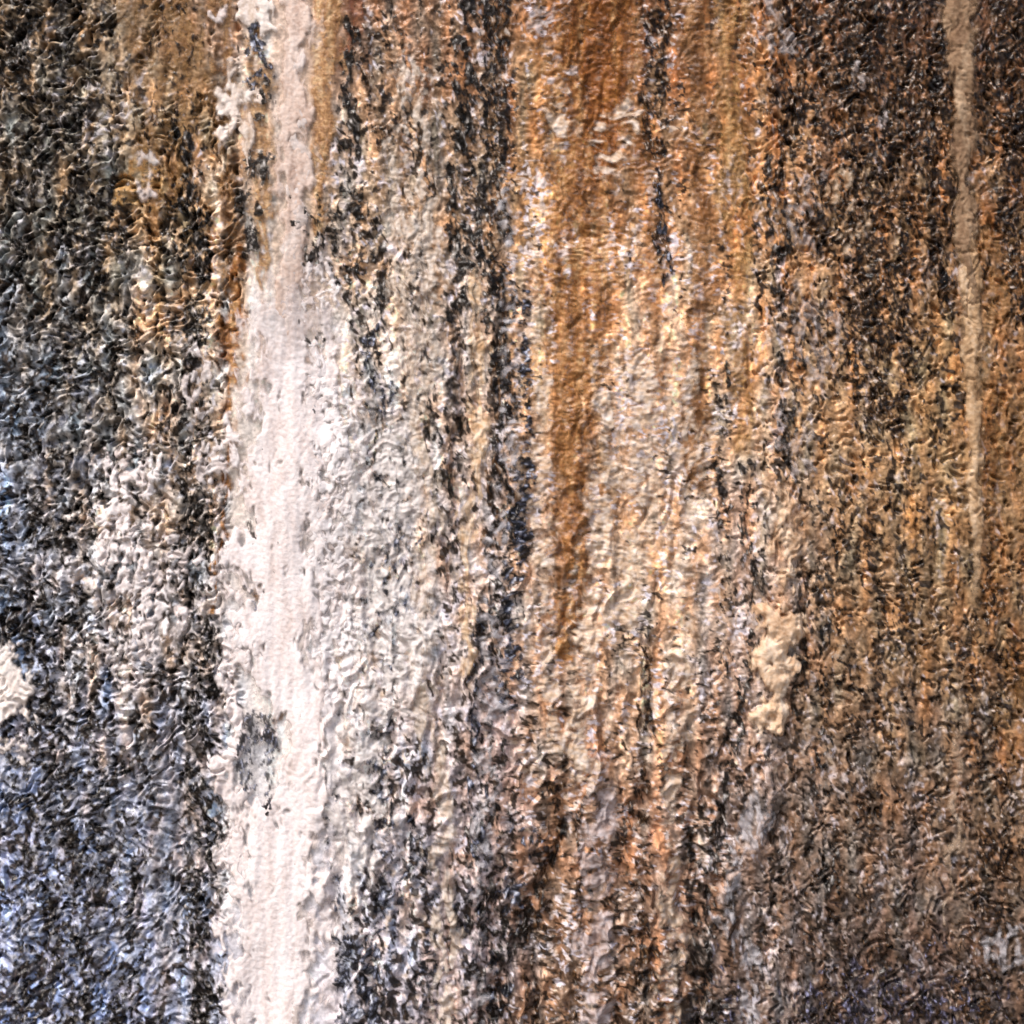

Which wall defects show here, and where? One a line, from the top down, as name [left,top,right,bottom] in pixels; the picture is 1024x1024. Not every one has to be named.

rust [112,0,276,589]
damp [0,0,772,1024]
rust [538,0,636,661]